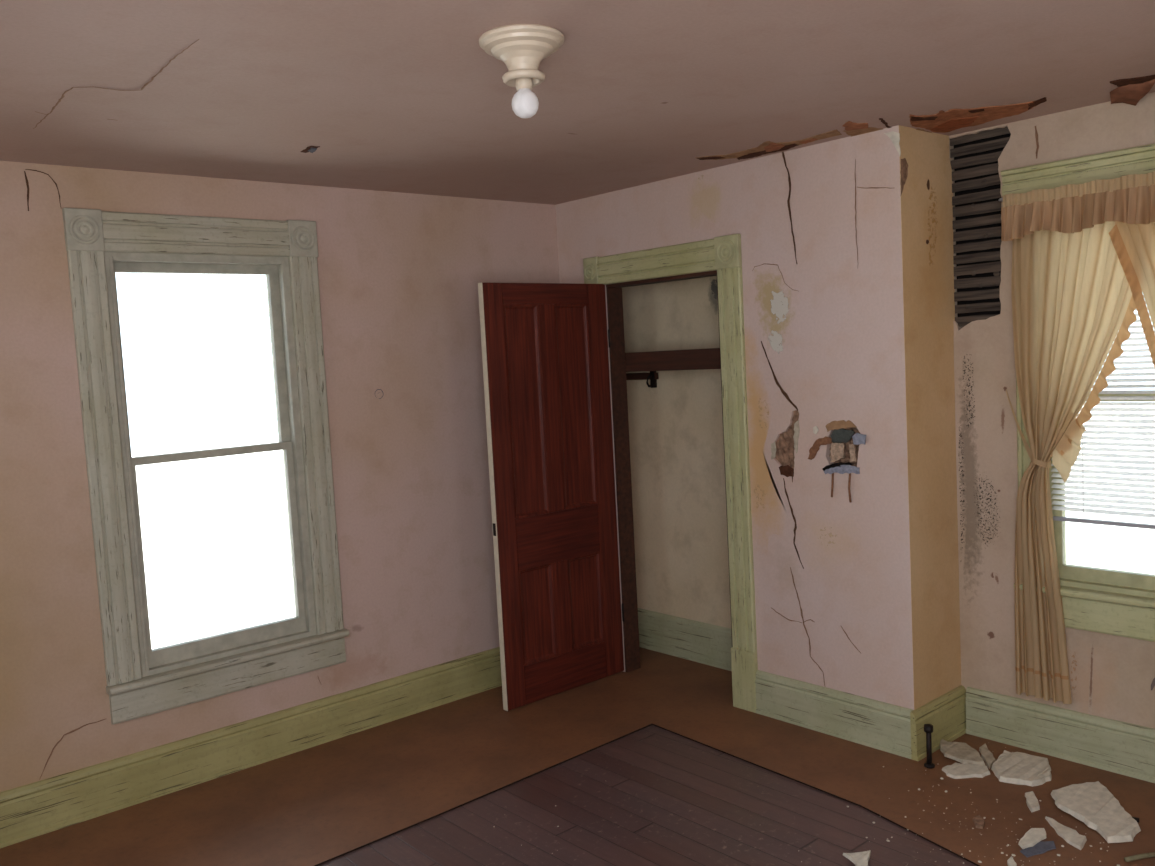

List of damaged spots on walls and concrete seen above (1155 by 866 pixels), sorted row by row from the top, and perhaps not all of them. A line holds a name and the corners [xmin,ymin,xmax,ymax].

crack [33,39,199,129]
flaking render [844,127,908,196]
crack [782,152,797,264]
crack [761,341,798,411]
leakage [910,147,1000,629]
flaking render [771,410,800,477]
crack [772,473,861,685]